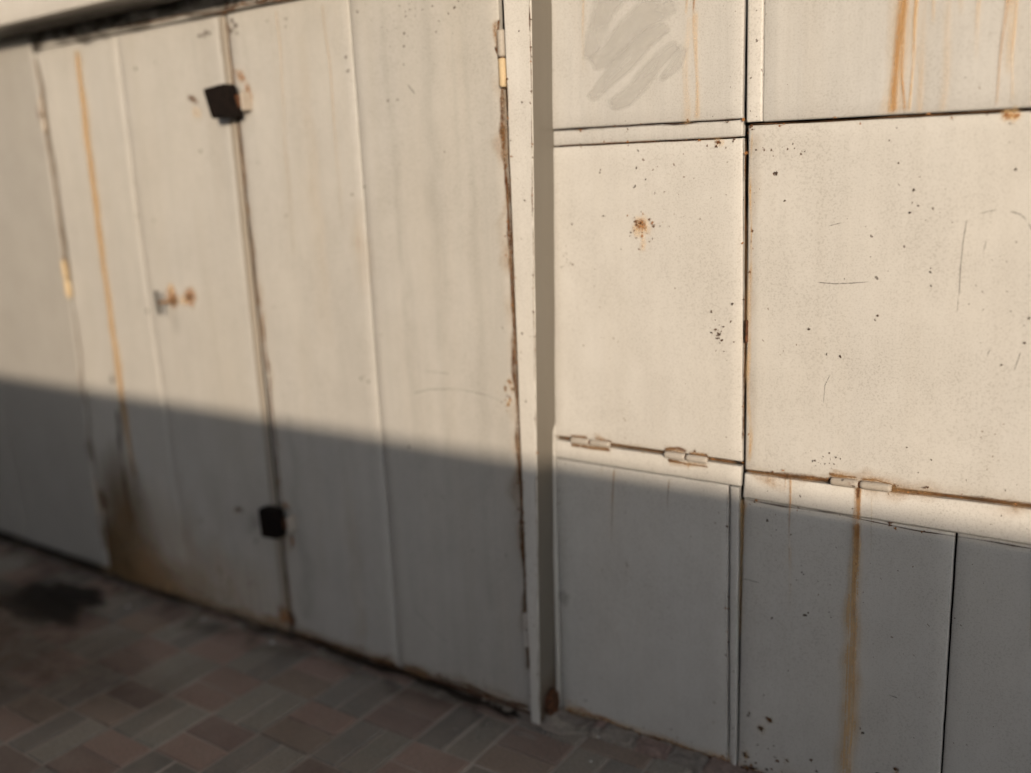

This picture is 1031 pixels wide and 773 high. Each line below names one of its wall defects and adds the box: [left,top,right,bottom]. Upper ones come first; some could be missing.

corrosion [76,52,134,469]
corrosion [500,78,539,679]
corrosion [600,118,785,244]
corrosion [860,0,917,124]
corrosion [921,110,1020,119]
leakage [0,476,521,717]
corrosion [563,435,1031,773]